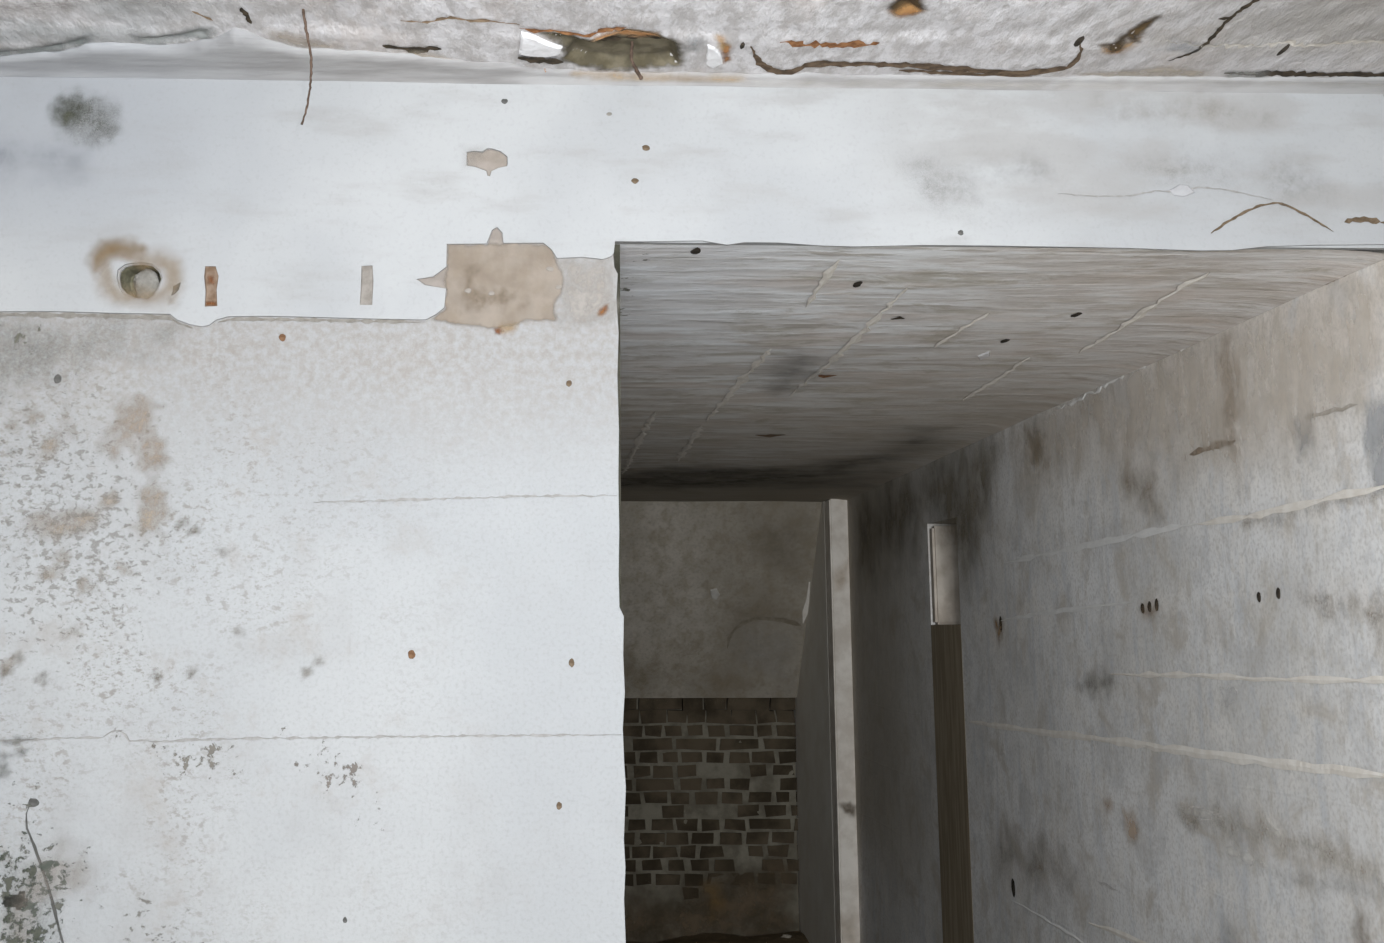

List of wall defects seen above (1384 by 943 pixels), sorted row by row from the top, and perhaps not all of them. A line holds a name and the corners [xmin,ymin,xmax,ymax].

spalling [518,27,683,79]
crack [750,41,1083,77]
crack [1166,0,1384,77]
peeling [467,150,507,176]
crack [1060,186,1384,233]
peeling [219,228,608,342]
crack [25,802,64,943]
leakage [0,827,90,943]